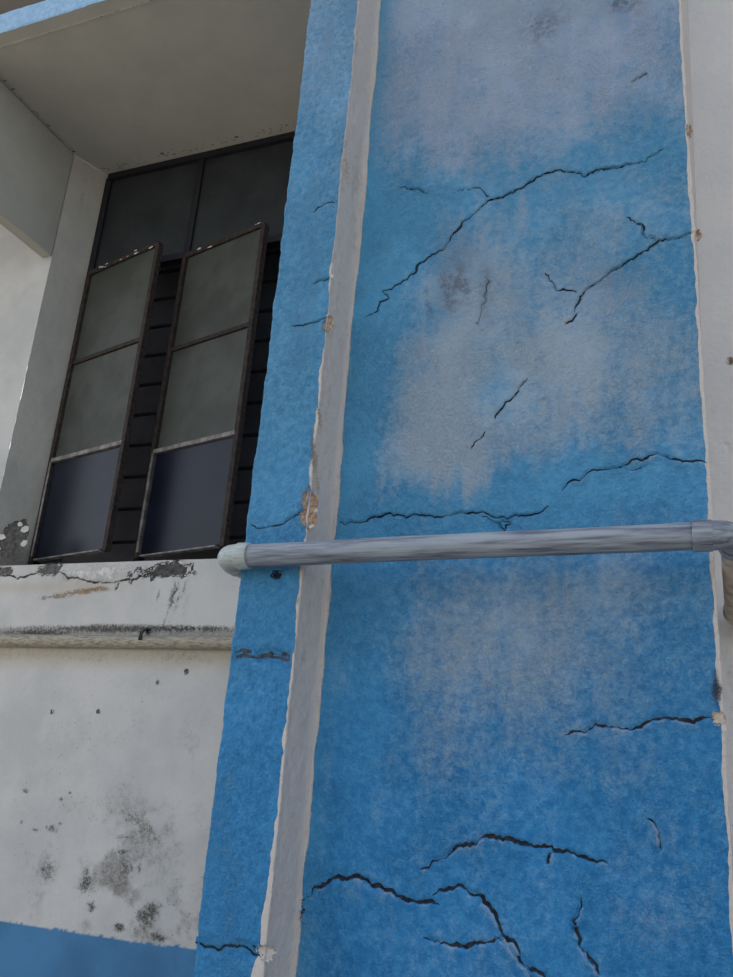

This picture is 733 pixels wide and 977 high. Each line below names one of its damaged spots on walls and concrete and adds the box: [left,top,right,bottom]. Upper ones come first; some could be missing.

crack [366,146,663,317]
crack [545,217,696,324]
crack [473,274,493,326]
spalling [299,485,319,529]
crack [338,454,707,531]
spalling [35,562,63,577]
spalling [127,559,196,582]
crack [562,716,727,744]
crack [644,818,662,853]
water stain [137,902,164,940]
crack [299,833,608,977]
crack [195,936,263,957]